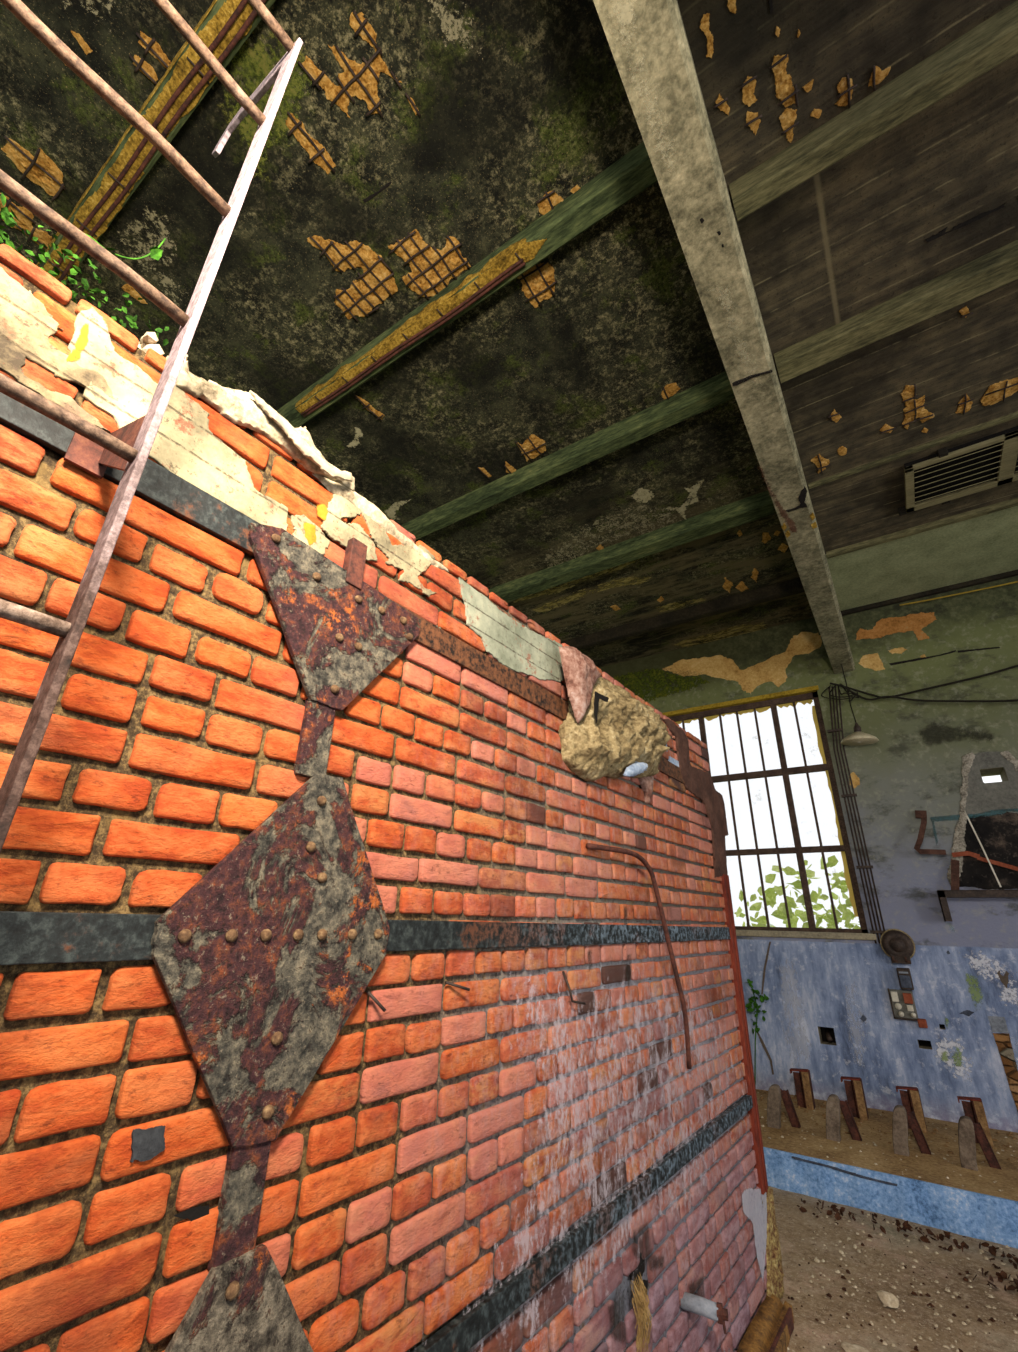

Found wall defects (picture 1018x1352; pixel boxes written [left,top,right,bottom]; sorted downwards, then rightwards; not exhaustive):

leakage [63,0,119,15]
leakage [422,0,483,59]
spalling [0,0,267,282]
leakage [218,30,313,182]
leakage [117,206,187,307]
peeling [0,267,158,433]
spalling [295,229,558,421]
peeling [148,385,436,597]
leakage [347,427,363,448]
leakage [544,479,704,568]
peeling [458,577,565,682]
flaking render [947,751,1018,885]